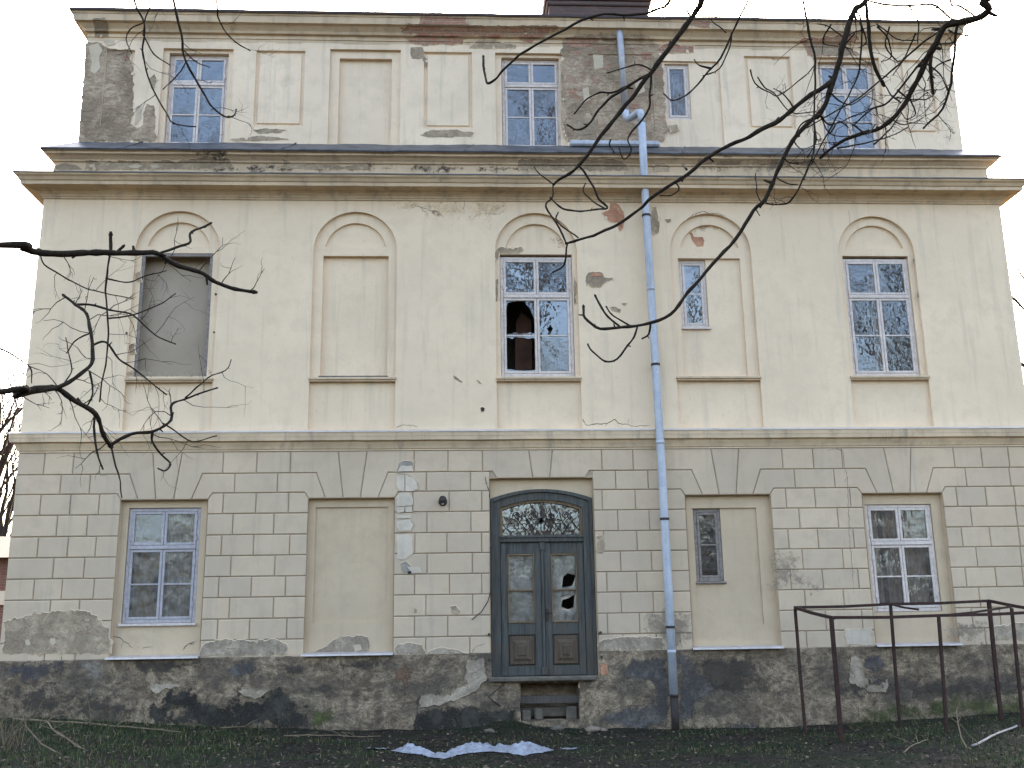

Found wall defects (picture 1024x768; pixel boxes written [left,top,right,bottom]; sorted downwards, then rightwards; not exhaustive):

spalling [79,17,157,143]
spalling [400,15,694,142]
spalling [572,271,615,306]
peeling [396,459,422,575]
spalling [2,609,114,657]
leakage [4,671,132,719]
leakage [136,660,185,673]
leakage [148,687,314,728]
spalling [199,638,288,657]
peeling [394,642,488,712]
leakage [602,655,759,728]
peeling [844,627,889,694]